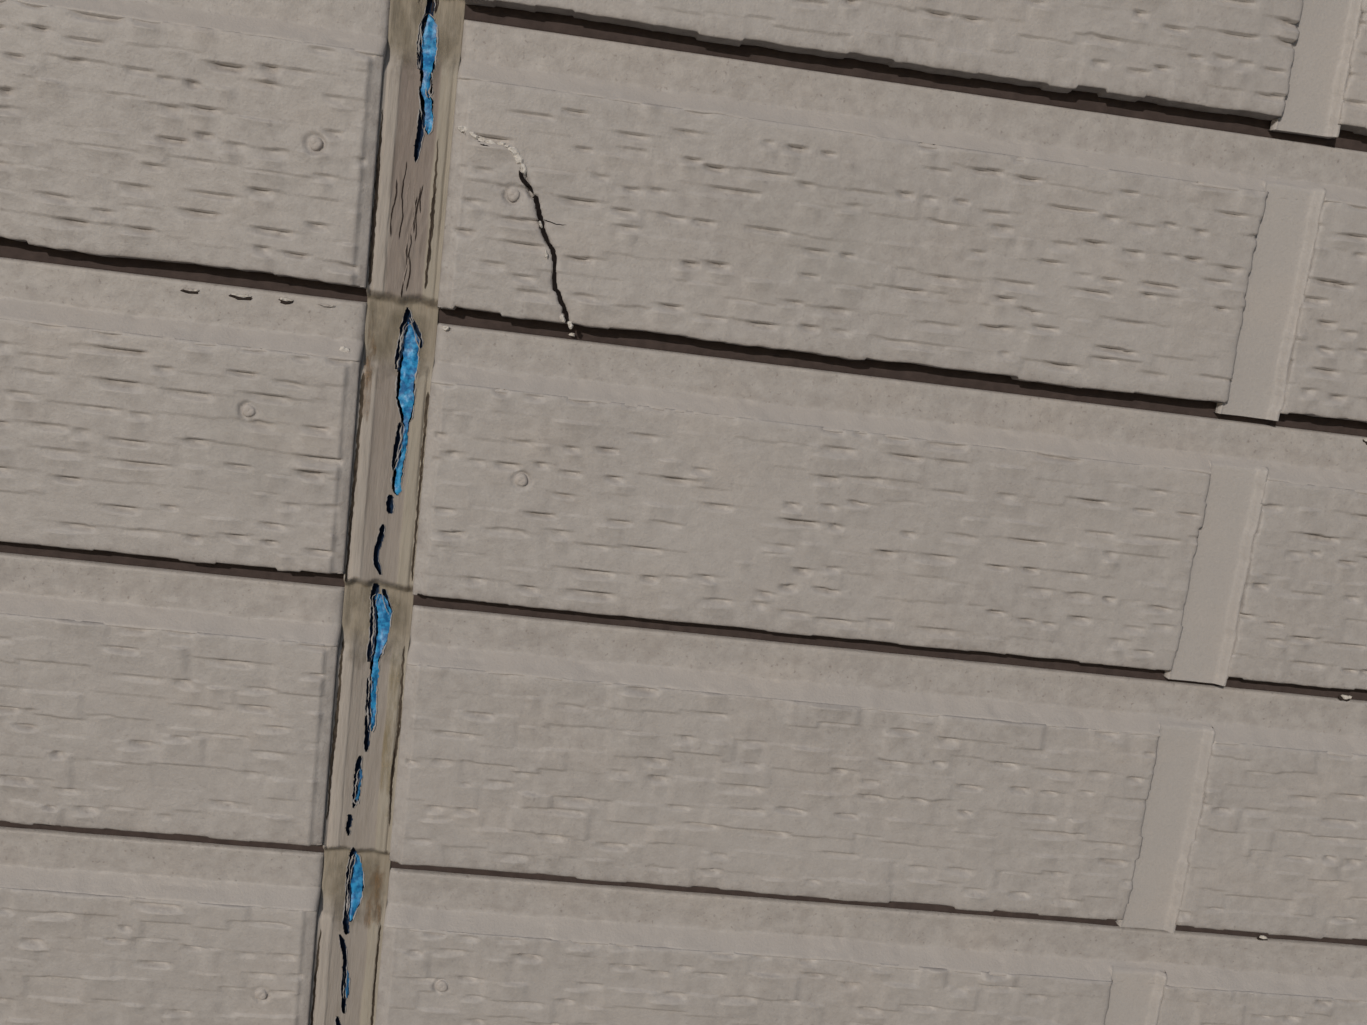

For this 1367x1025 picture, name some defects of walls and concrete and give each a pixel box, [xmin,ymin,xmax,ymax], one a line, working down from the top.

crack [310,0,573,1025]